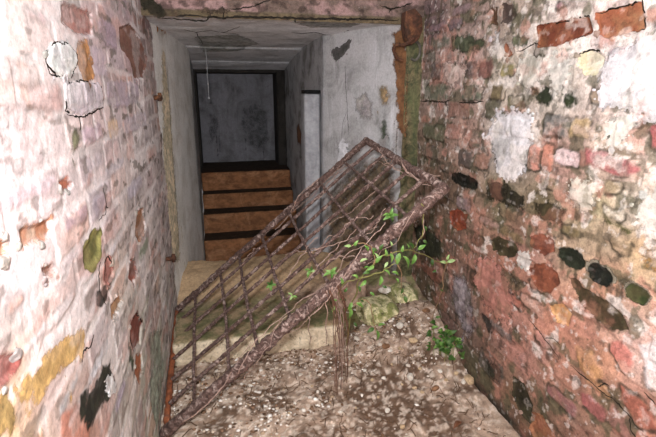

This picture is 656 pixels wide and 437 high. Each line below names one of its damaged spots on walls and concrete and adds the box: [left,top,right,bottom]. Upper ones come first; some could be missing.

spalling [42,39,103,116]
spalling [119,23,148,83]
crack [159,0,413,44]
flaking render [331,39,351,61]
rust [391,27,408,146]
peeling [488,0,656,155]
peeling [482,106,534,182]
peeling [104,374,117,397]
crack [529,320,641,437]